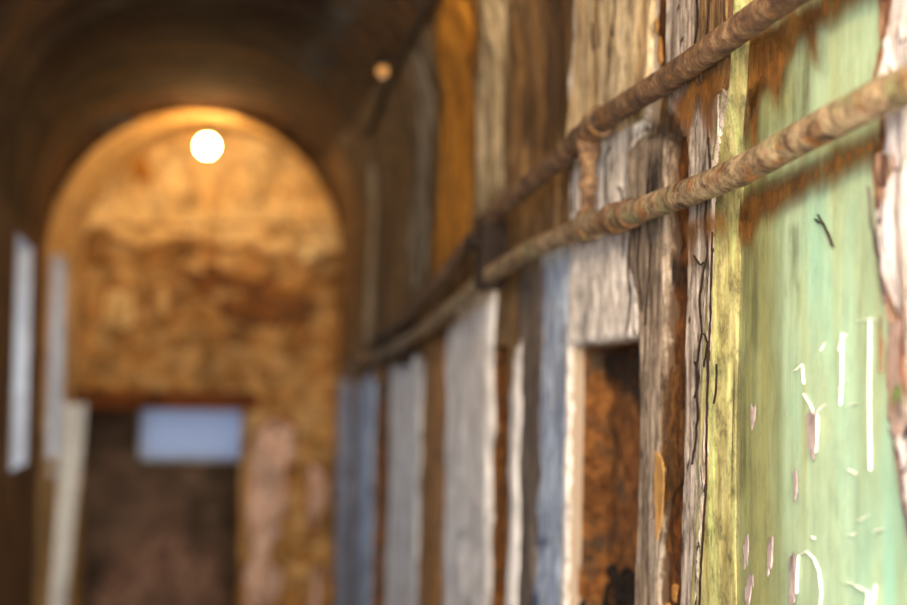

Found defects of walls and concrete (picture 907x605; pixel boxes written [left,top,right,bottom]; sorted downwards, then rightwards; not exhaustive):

rust [432,0,475,277]
spalling [678,136,689,181]
rust [675,69,725,136]
crack [705,137,713,169]
rust [743,0,854,146]
rust [738,132,885,245]
flaking render [878,0,907,76]
flaking render [871,107,907,538]
spalling [648,208,689,605]
crack [691,200,718,605]
peeling [736,213,796,605]
peeling [806,409,817,462]